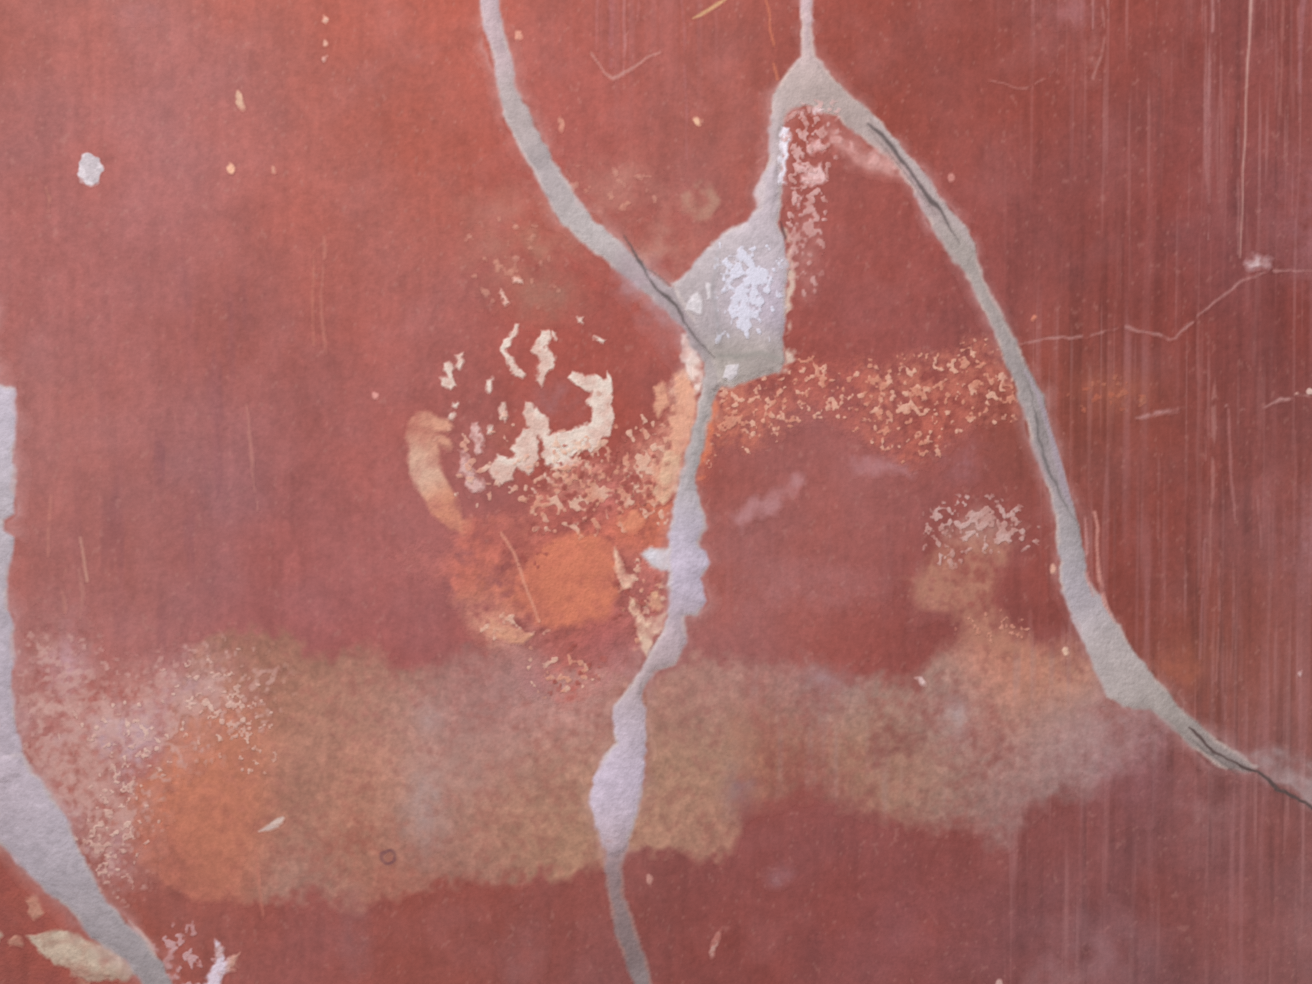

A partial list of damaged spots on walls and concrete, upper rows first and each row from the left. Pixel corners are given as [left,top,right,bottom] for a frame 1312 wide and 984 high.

crack [0,290,186,984]
water stain [24,535,624,984]
peeling [497,275,524,308]
peeling [385,322,701,719]
peeling [575,315,608,345]
crack [467,0,728,984]
water stain [726,469,809,537]
peeling [700,330,1016,486]
water stain [632,555,1261,874]
crack [743,0,1312,815]
peeling [0,863,122,984]
water stain [809,857,1183,984]